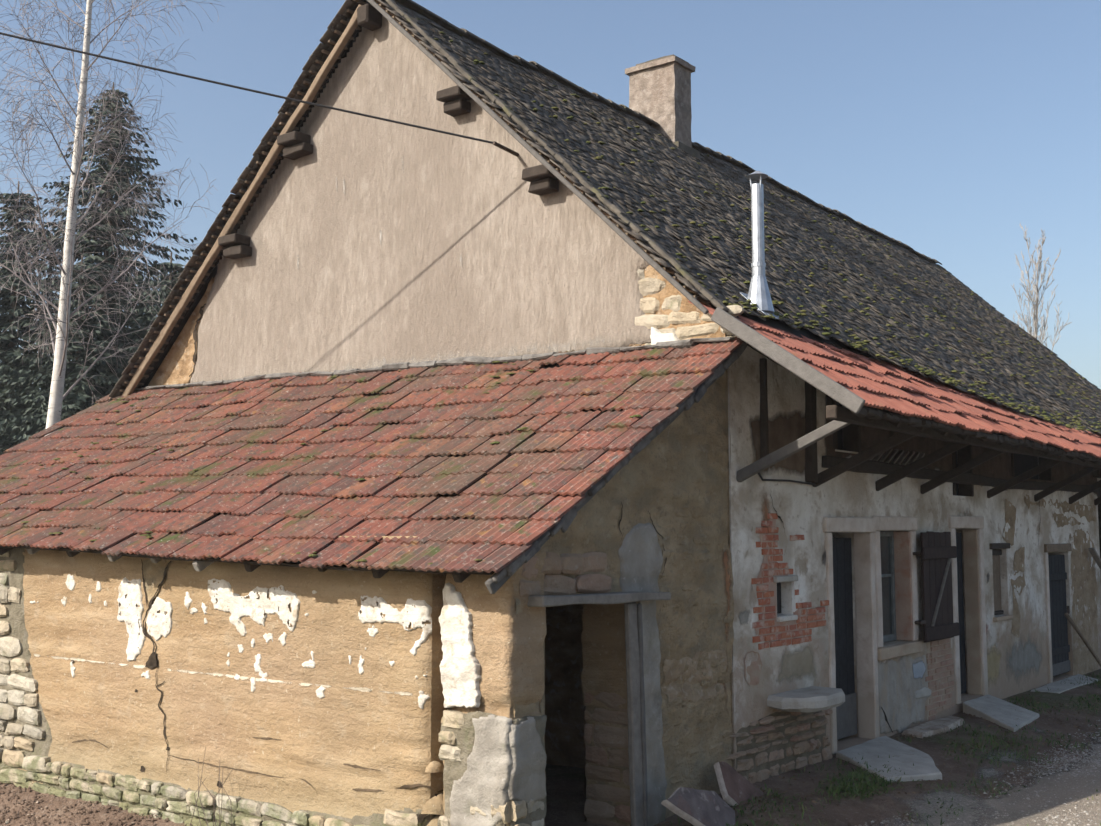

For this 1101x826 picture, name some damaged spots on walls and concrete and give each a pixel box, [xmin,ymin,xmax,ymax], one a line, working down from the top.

flaking render [61,574,75,607]
crack [141,559,171,772]
flaking render [88,577,309,692]
flaking render [302,651,315,668]
flaking render [348,583,481,723]
spalling [744,513,829,685]
spalling [1002,495,1098,675]
spalling [421,793,444,826]
spalling [425,760,444,773]